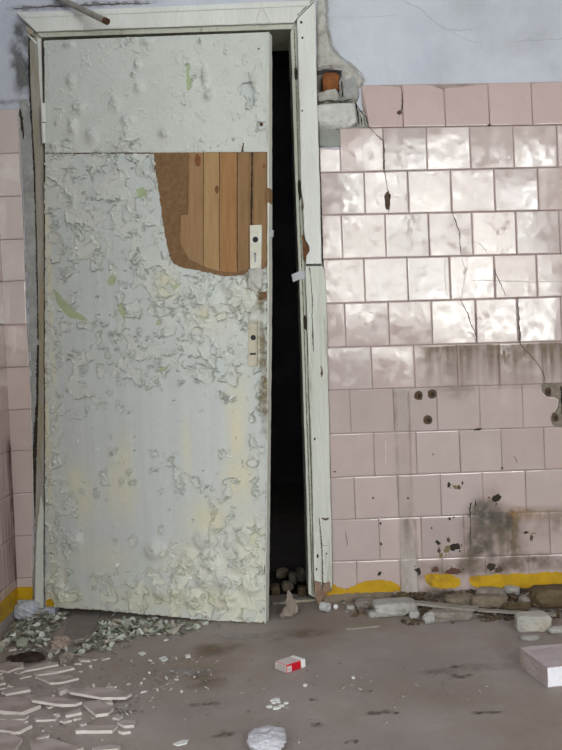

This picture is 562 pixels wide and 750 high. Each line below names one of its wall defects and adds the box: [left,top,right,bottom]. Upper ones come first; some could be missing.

spalling [316,0,368,147]
crack [367,126,391,214]
crack [445,212,560,384]
leakage [426,344,500,360]
leakage [510,343,562,364]
spalling [541,383,562,427]
leakage [462,505,517,571]